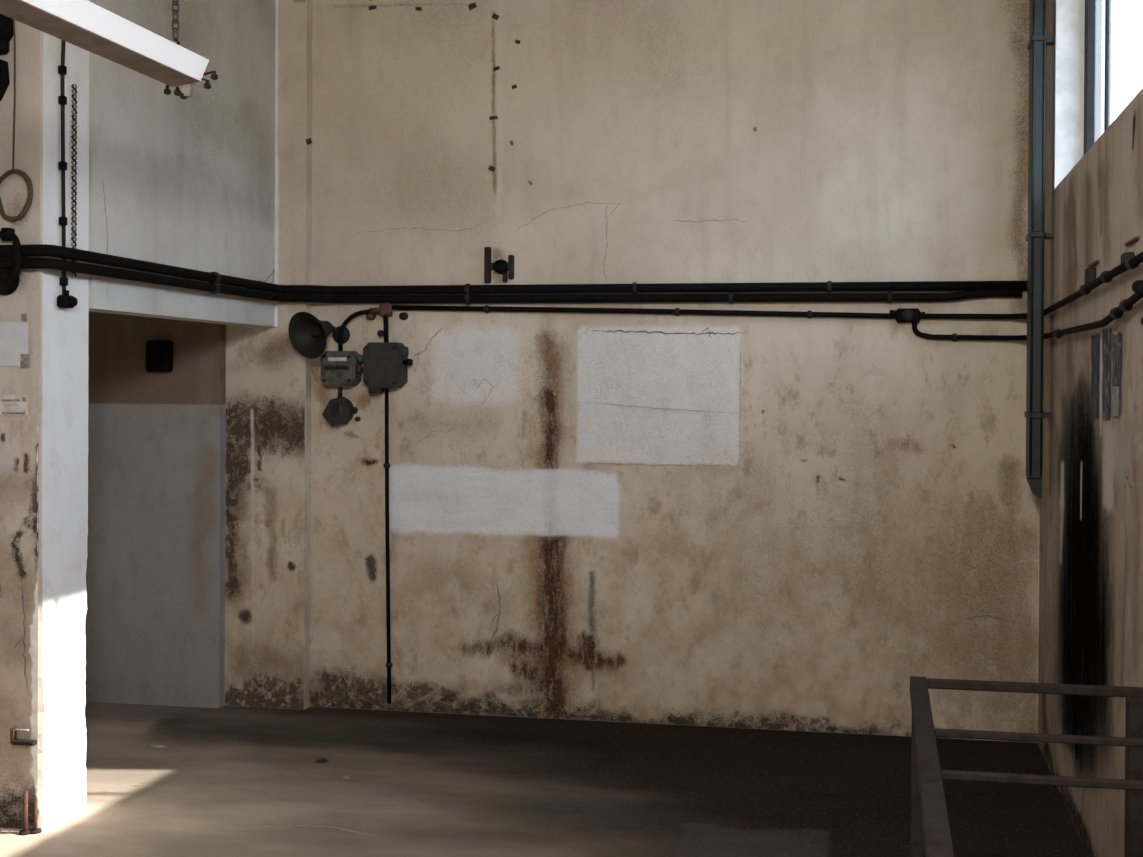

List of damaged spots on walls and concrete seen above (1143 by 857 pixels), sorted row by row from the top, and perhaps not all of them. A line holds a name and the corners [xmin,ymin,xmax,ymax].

crack [516,202,622,284]
leakage [27,443,39,575]
leakage [183,327,305,617]
corrosion [522,325,573,482]
crack [594,328,744,338]
corrosion [460,509,629,719]
leakage [225,384,1098,857]